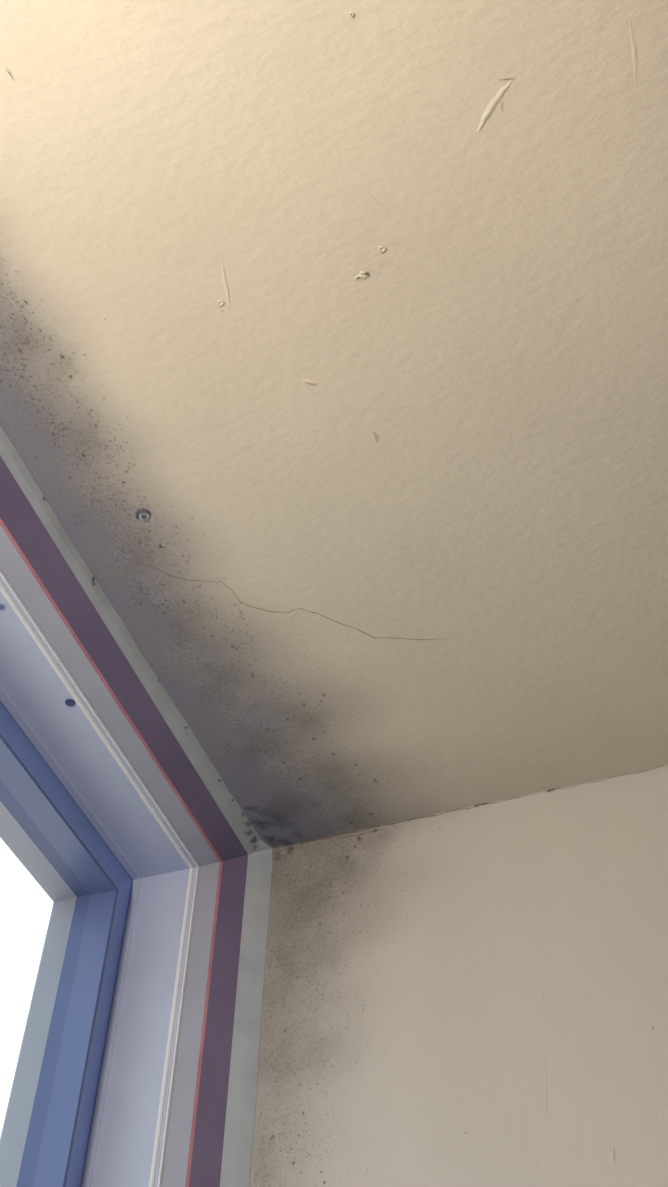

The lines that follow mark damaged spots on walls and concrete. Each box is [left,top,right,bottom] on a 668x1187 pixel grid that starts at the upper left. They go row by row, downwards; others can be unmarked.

water stain [0,321,378,933]